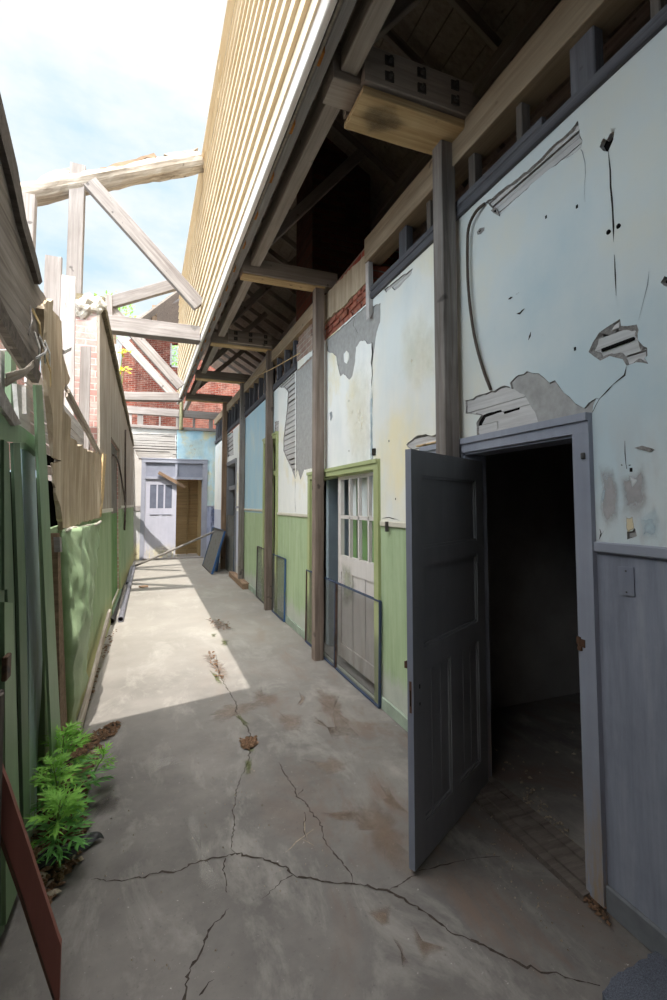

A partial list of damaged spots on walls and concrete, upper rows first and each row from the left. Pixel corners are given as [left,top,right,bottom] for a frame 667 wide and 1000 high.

flaking render [485,121,582,216]
crack [581,150,621,289]
flaking render [325,284,380,379]
flaking render [589,319,648,366]
flaking render [466,371,596,435]
crack [95,655,600,1000]